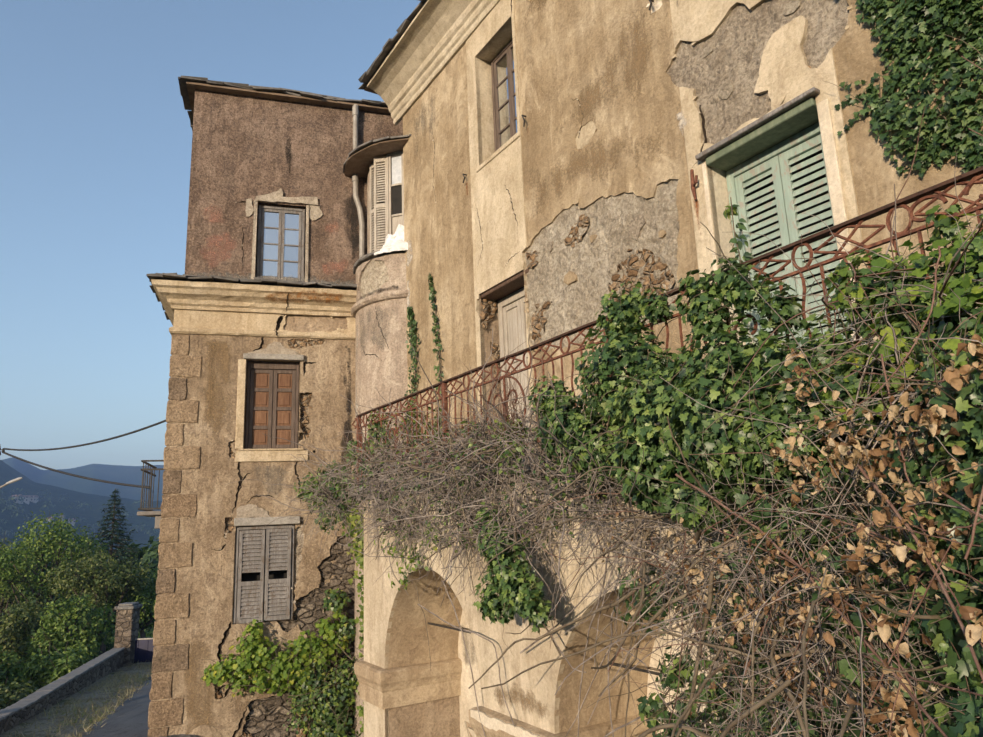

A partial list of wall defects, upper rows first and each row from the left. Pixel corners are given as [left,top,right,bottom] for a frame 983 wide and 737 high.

spalling [666,0,852,145]
crack [252,293,289,352]
spalling [524,178,679,353]
spalling [298,393,313,441]
crack [212,461,301,551]
crack [214,623,248,737]
spalling [239,525,355,737]